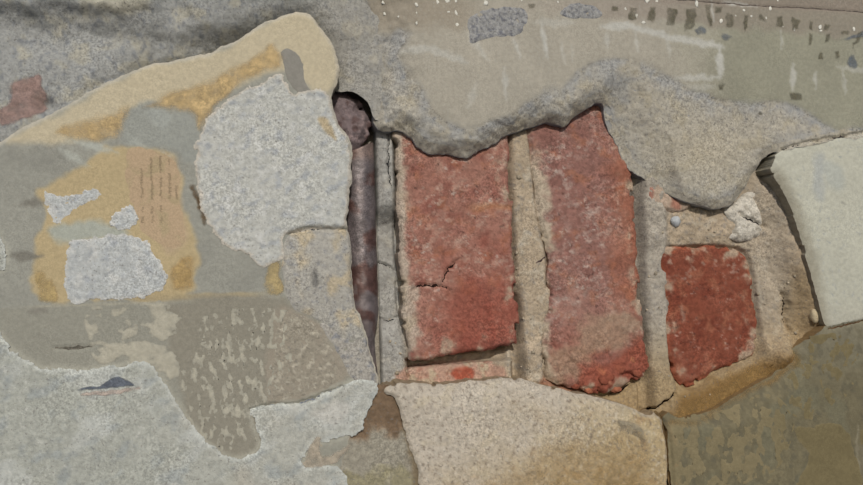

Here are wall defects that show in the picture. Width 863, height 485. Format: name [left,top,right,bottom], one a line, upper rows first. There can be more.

peeling [63,205,293,452]
spalling [304,323,419,485]
crack [416,263,455,289]